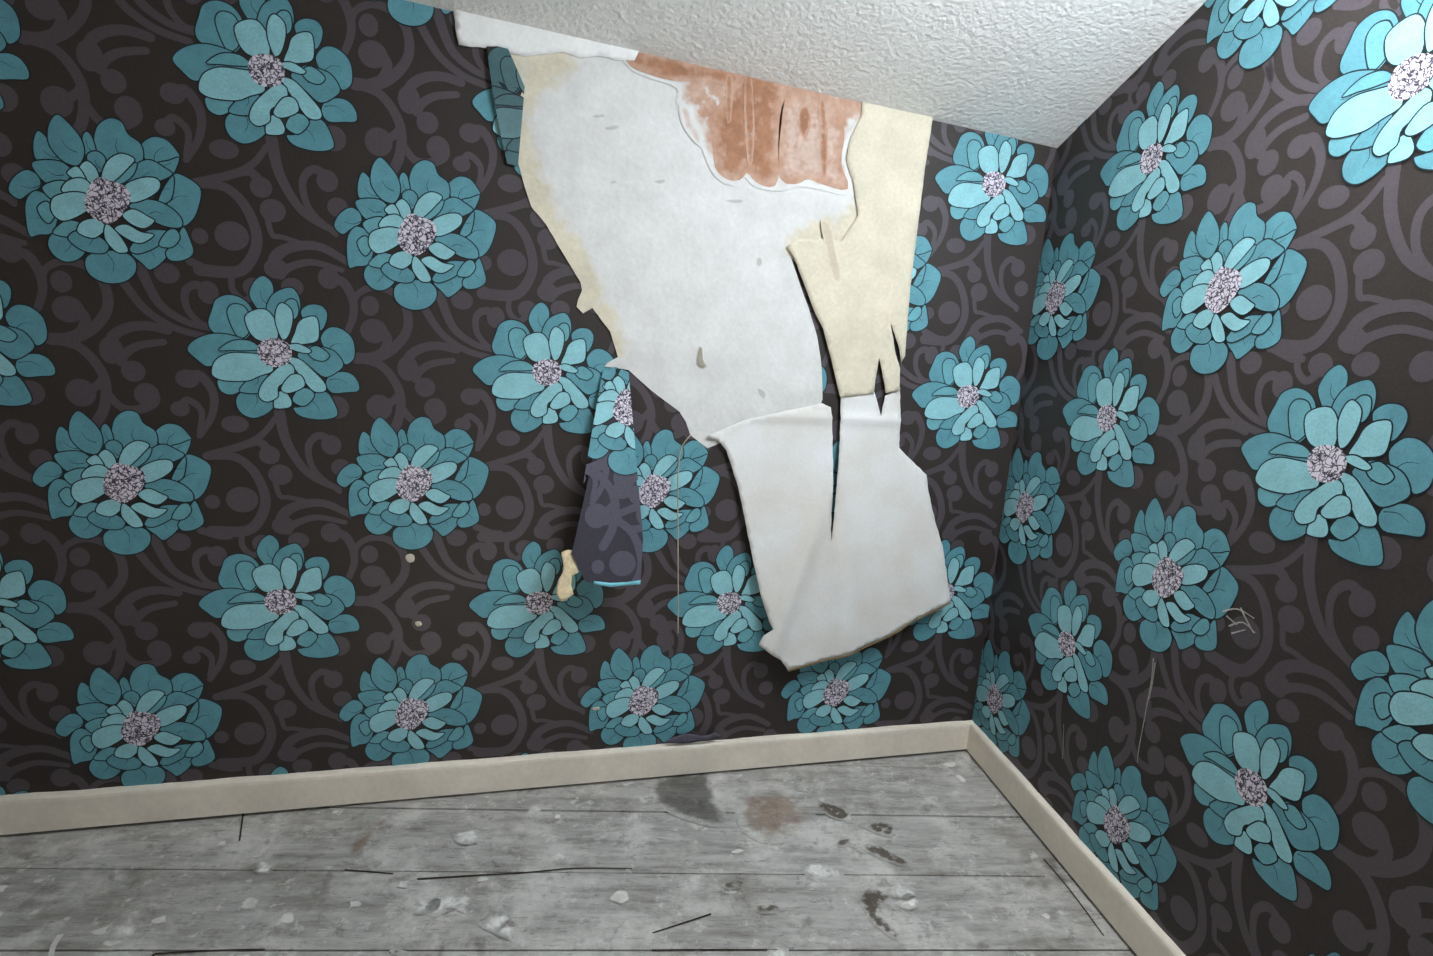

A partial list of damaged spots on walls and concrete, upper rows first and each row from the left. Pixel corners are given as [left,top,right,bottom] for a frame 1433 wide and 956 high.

flaking render [452,9,854,448]
damp [623,52,862,195]